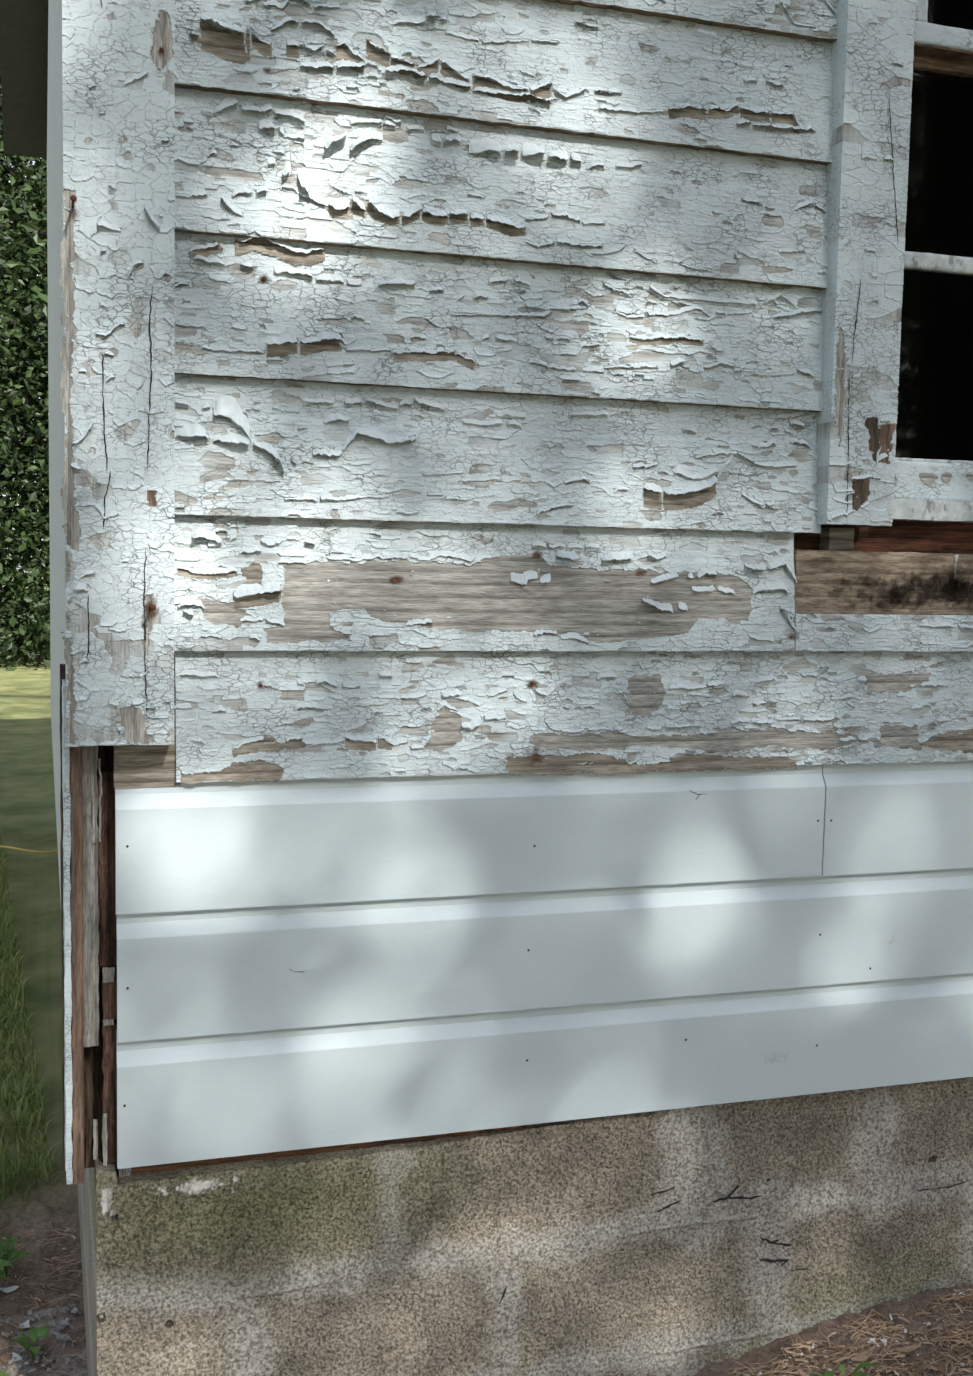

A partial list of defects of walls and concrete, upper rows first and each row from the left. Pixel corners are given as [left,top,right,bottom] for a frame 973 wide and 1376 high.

peeling [324,113,643,169]
peeling [268,153,657,263]
peeling [190,237,362,285]
peeling [59,190,92,551]
peeling [529,333,704,372]
peeling [174,395,297,475]
peeling [303,397,445,457]
peeling [613,411,809,512]
peeling [852,416,897,511]
peeling [178,527,799,644]
water stain [835,570,973,611]
peeling [181,672,973,784]